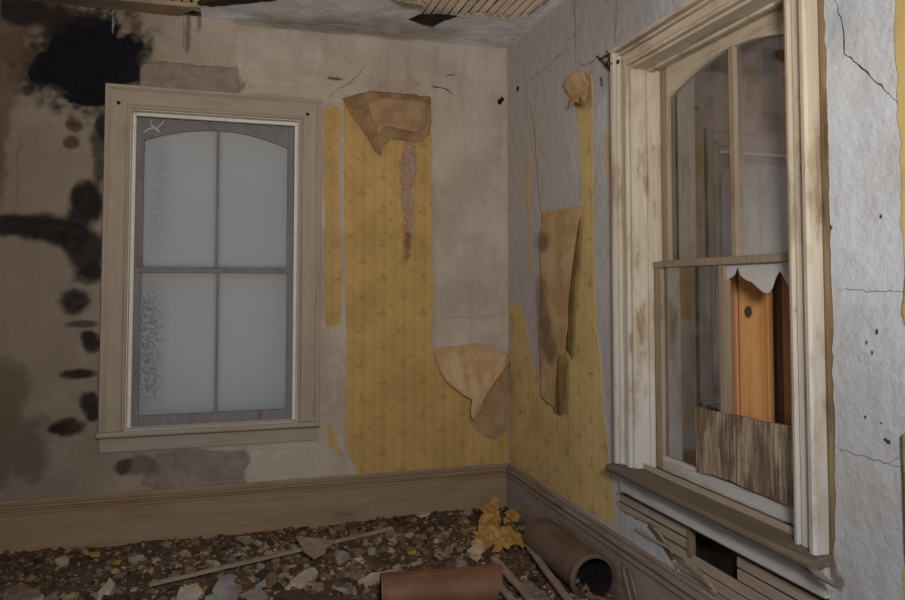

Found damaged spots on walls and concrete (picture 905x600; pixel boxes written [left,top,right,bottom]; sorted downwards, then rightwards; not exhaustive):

flaking render [168,0,276,12]
flaking render [394,0,546,27]
crack [834,0,898,105]
water stain [0,0,152,352]
water stain [62,369,94,378]
mould [49,393,98,436]
flaking render [643,463,794,535]
flaking render [620,493,829,600]